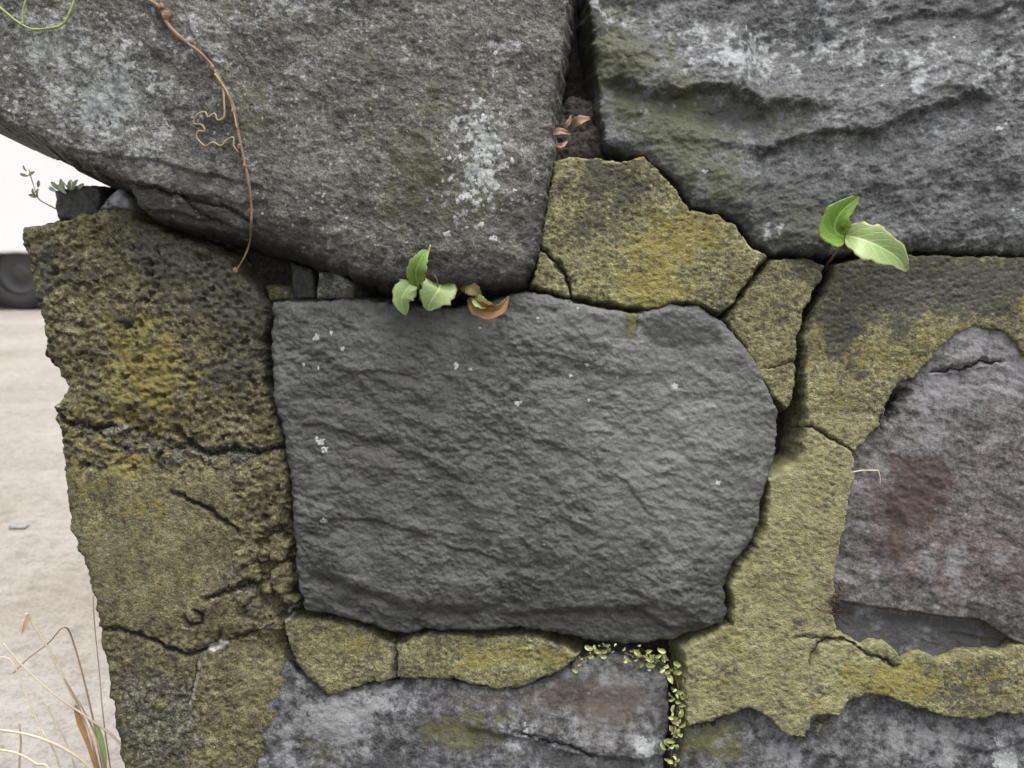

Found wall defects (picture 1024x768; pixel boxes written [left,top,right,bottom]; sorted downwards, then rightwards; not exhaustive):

crack [931,360,1001,373]
crack [60,413,115,432]
crack [157,432,286,459]
crack [172,493,238,530]
crack [104,578,286,712]
crack [794,635,902,667]